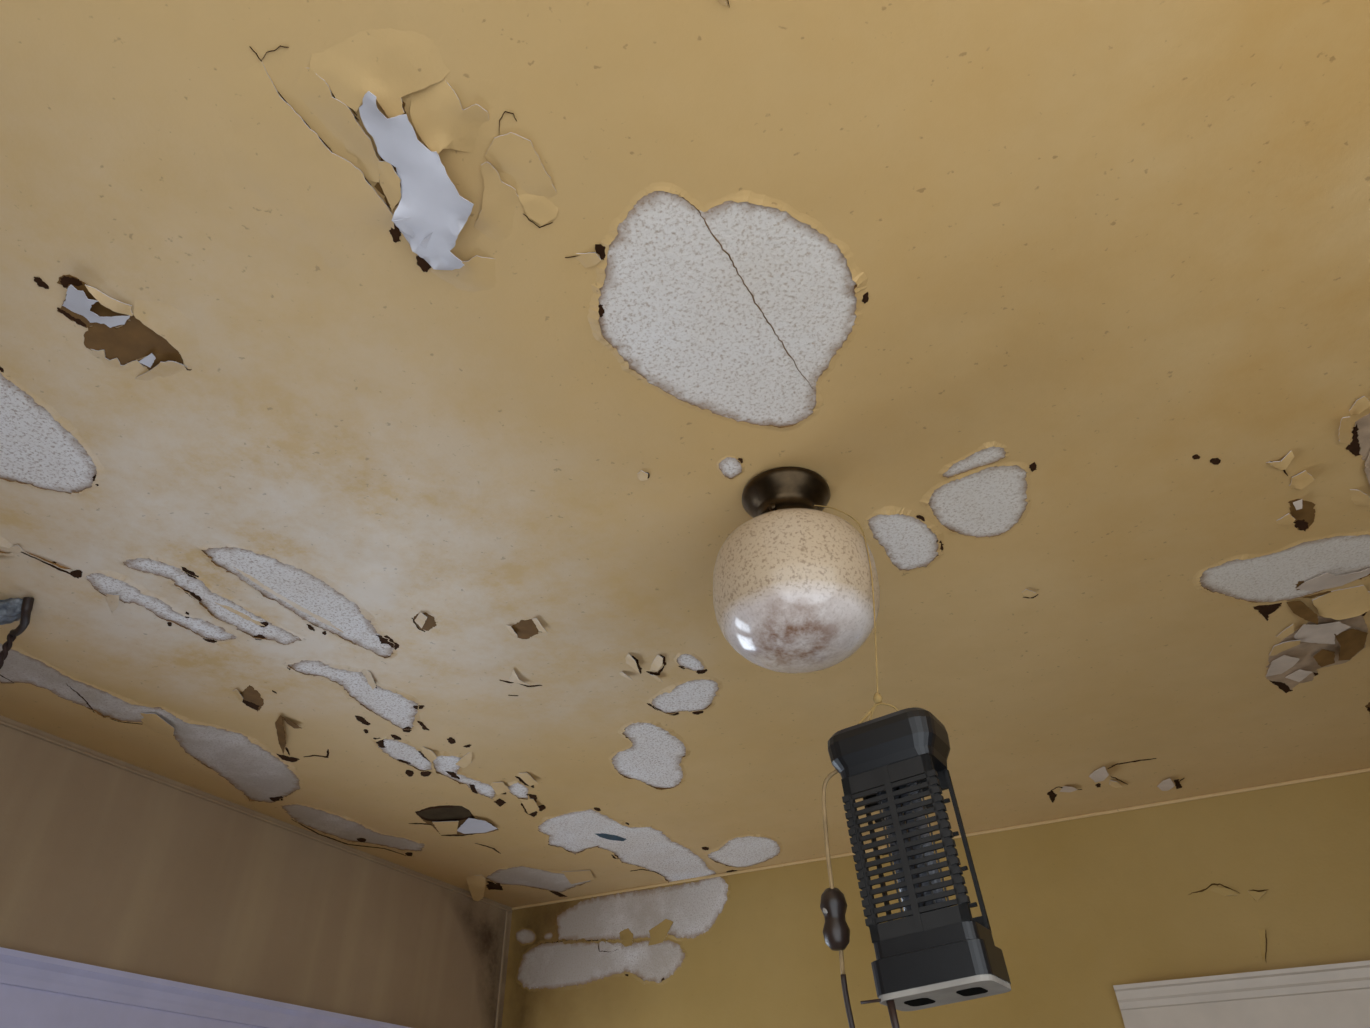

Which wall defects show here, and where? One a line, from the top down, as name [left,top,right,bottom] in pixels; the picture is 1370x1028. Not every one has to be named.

peeling [218,28,558,292]
peeling [0,365,106,497]
peeling [34,274,202,381]
peeling [565,181,869,432]
peeling [863,441,1037,572]
peeling [1192,451,1370,693]
peeling [1339,396,1370,507]
peeling [0,542,783,992]